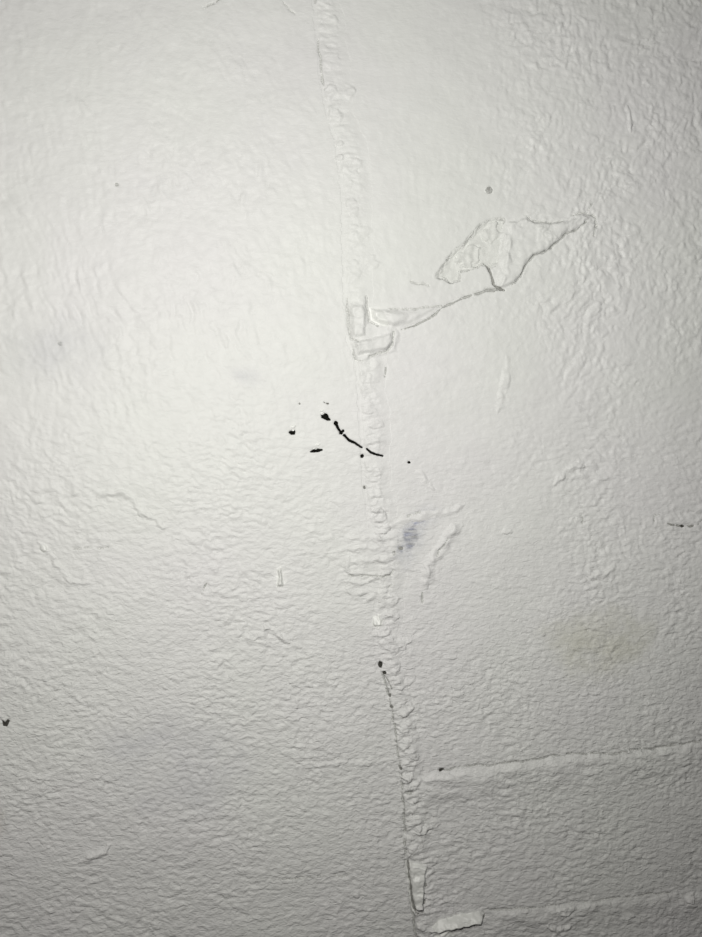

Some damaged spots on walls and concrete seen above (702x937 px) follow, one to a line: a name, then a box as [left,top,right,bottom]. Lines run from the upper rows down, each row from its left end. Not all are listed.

crack [283,0,702,937]
peeling [435,171,671,291]